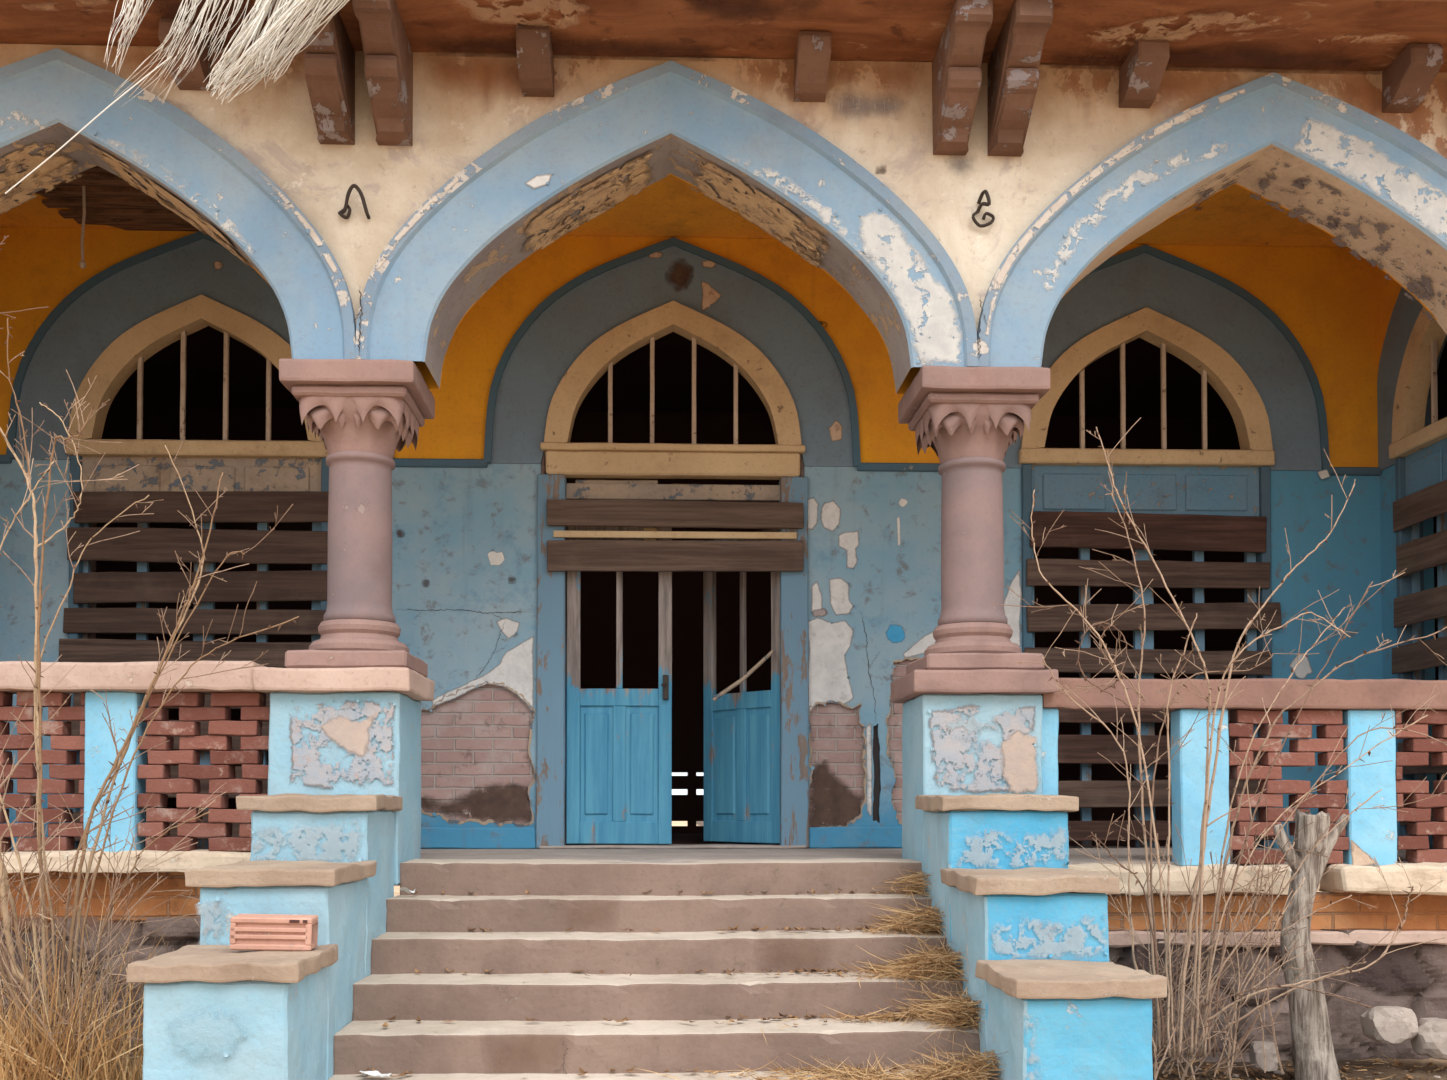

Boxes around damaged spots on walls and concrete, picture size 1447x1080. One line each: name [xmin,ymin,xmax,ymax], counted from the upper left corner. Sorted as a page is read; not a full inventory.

flaking render [0,142,81,215]
flaking render [87,132,255,270]
flaking render [524,151,654,252]
peeling [690,154,961,363]
peeling [986,89,1245,335]
peeling [1177,116,1447,320]
peeling [289,699,396,789]
spalling [421,618,536,827]
spalling [808,496,936,828]
peeling [927,704,1038,793]
peeling [957,829,1069,868]
peeling [993,915,1109,958]